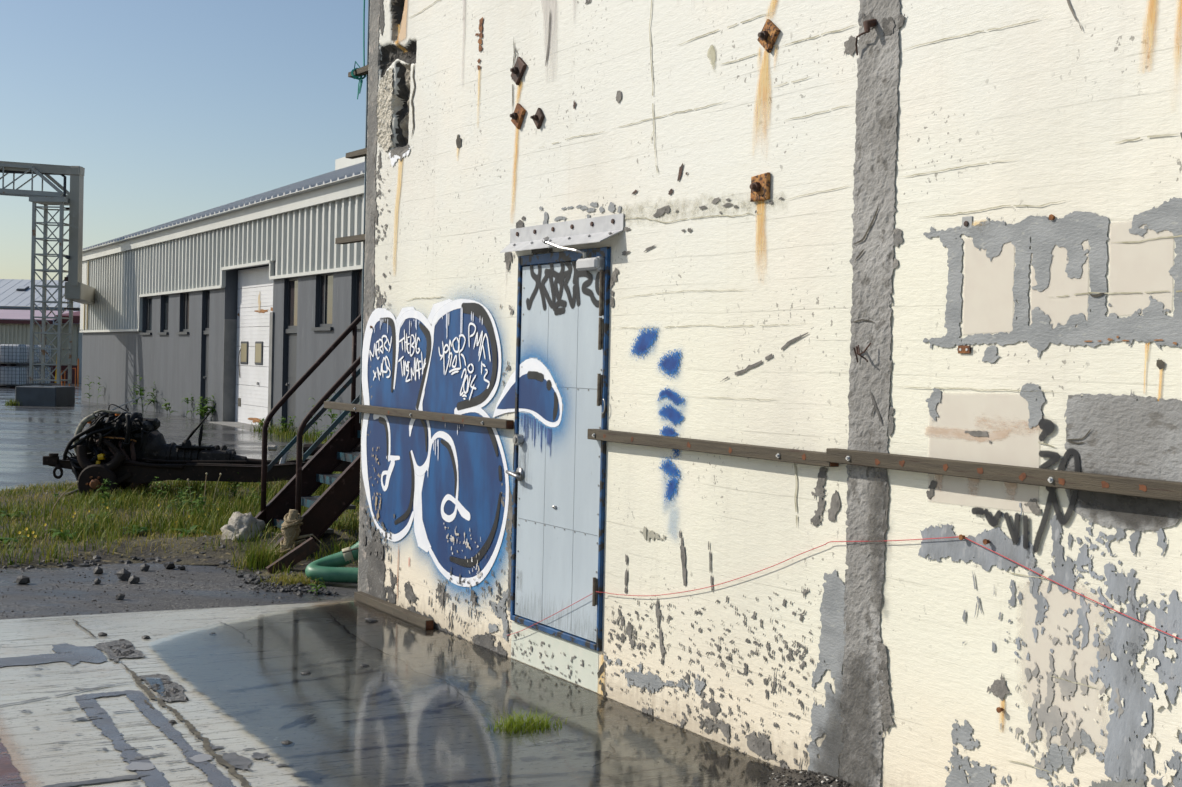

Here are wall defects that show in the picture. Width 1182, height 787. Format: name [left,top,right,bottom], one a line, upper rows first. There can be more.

rust [1147,0,1156,45]
rust [756,49,776,105]
peeling [363,0,417,351]
peeling [539,202,621,224]
peeling [653,163,688,217]
peeling [699,197,738,214]
rust [756,200,764,249]
peeling [844,0,905,453]
peeling [610,267,619,307]
peeling [926,480,937,499]
peeling [280,366,894,787]
peeling [918,489,1182,787]